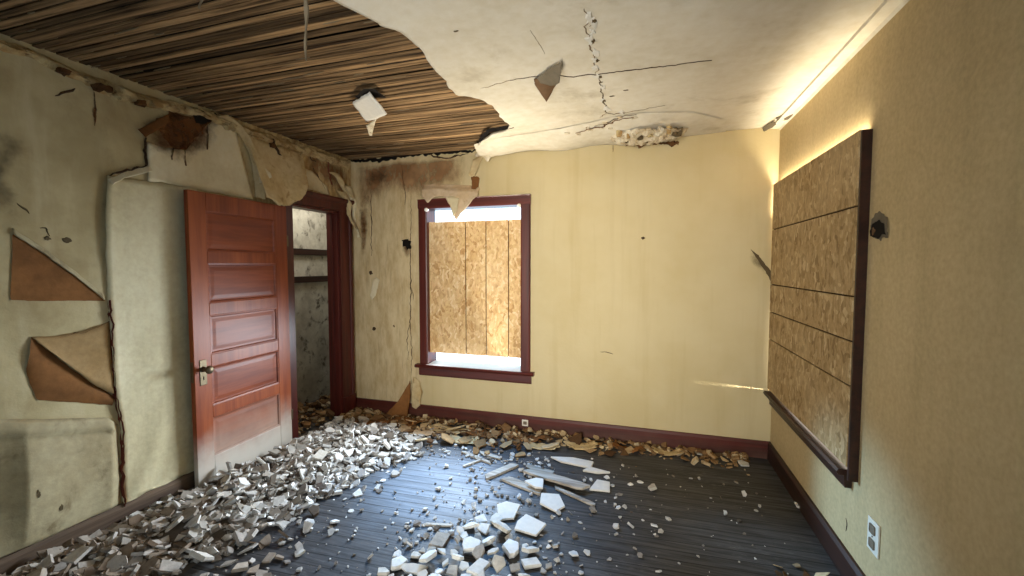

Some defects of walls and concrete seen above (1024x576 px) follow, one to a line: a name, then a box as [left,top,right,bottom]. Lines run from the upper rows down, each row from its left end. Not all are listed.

spalling [0,0,509,195]
spalling [534,61,562,102]
crack [480,11,712,136]
spalling [610,125,689,149]
peeling [763,114,793,131]
leakage [364,161,457,200]
hole [870,211,888,241]